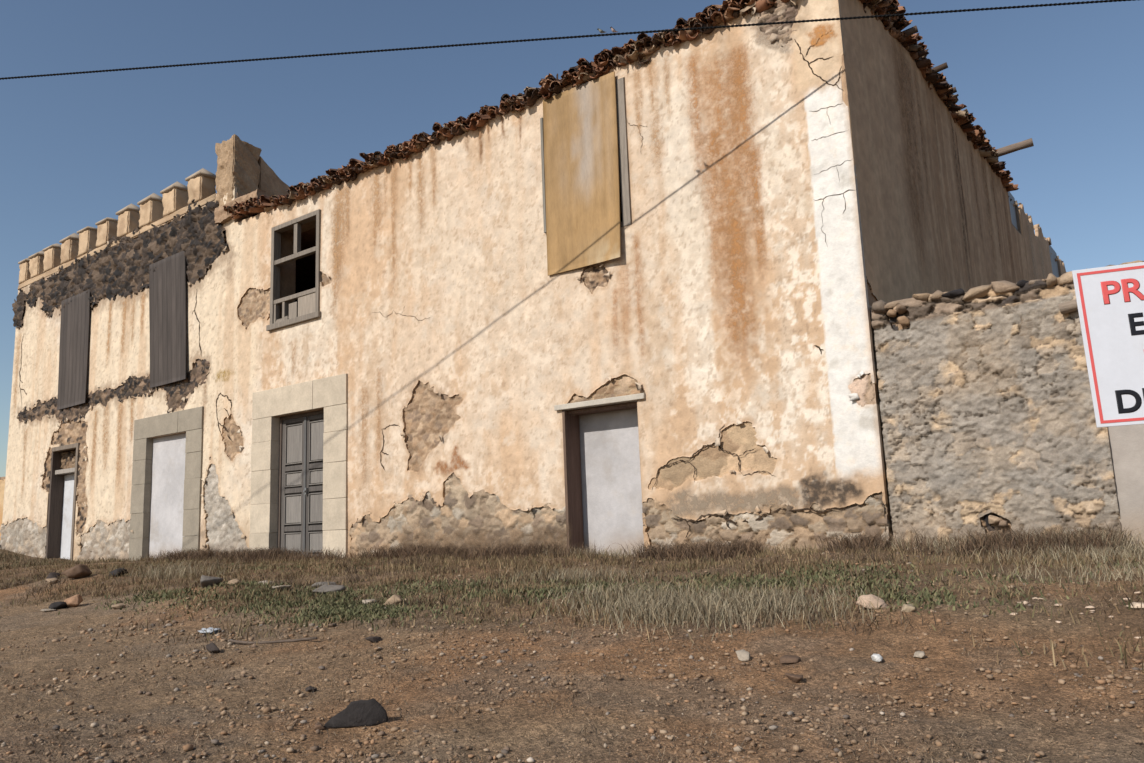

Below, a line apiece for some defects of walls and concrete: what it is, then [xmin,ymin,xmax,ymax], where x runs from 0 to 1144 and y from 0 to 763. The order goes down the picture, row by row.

crack [794,32,845,141]
crack [815,160,851,247]
spalling [12,199,228,329]
spalling [238,287,270,329]
spalling [0,518,47,558]
spalling [16,359,210,563]
spalling [201,457,249,555]
spalling [222,415,244,461]
spalling [400,381,463,472]
spalling [349,473,567,557]
spalling [569,375,646,403]
spalling [642,418,889,554]